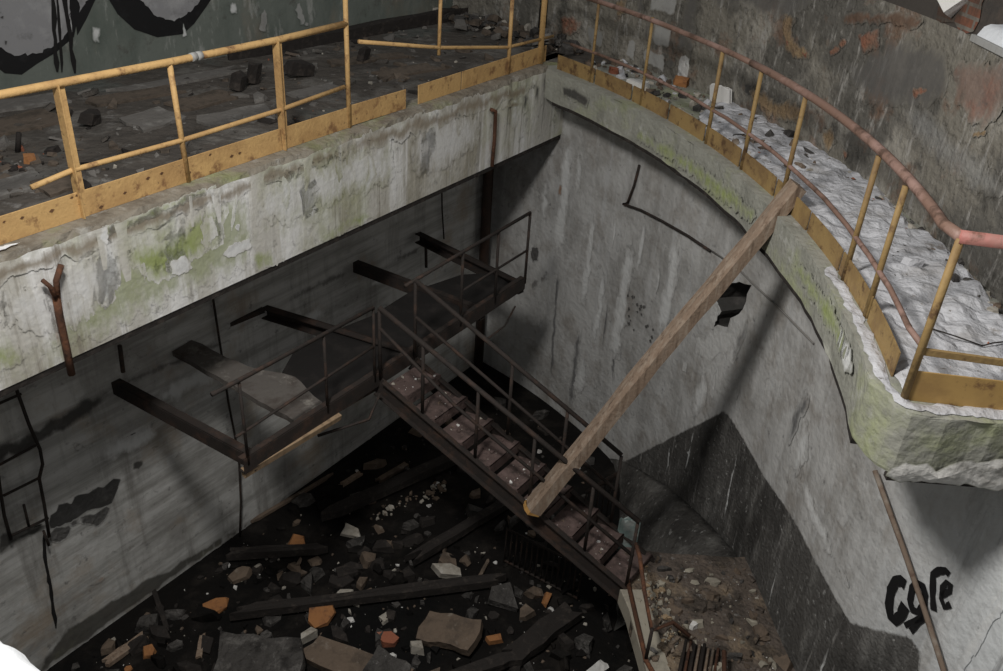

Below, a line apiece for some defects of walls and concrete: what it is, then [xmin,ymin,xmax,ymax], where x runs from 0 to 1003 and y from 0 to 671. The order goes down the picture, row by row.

water stain [0,76,546,338]
corrosion [40,264,76,377]
peeling [695,282,751,365]
water stain [157,370,224,403]
water stain [0,391,110,466]